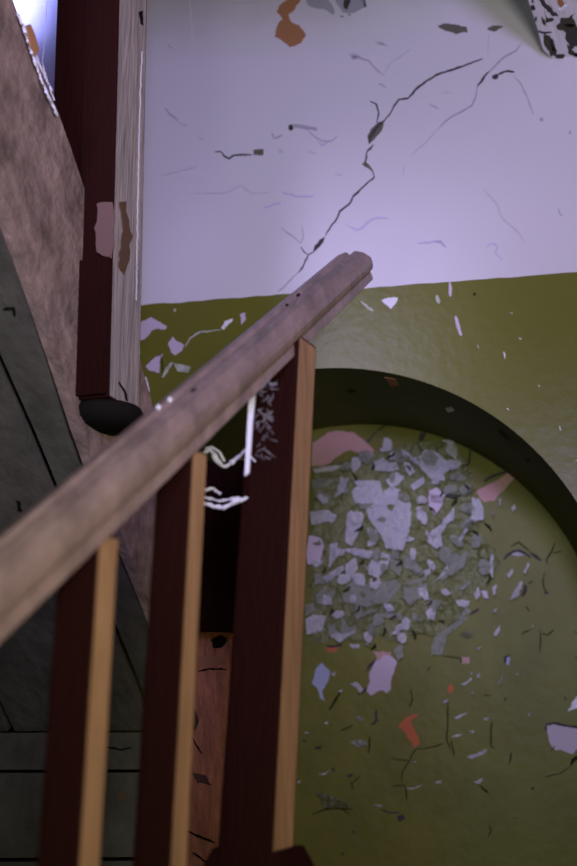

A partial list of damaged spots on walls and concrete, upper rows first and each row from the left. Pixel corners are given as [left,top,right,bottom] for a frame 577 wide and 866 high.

spalling [306,0,351,15]
spalling [438,23,468,34]
spalling [540,0,577,59]
peeling [94,51,143,300]
crack [278,35,533,292]
peeling [140,313,246,392]
peeling [305,431,516,700]
peeling [507,552,530,600]
peeling [443,657,480,703]
peeling [398,714,420,748]
peeling [547,724,577,754]